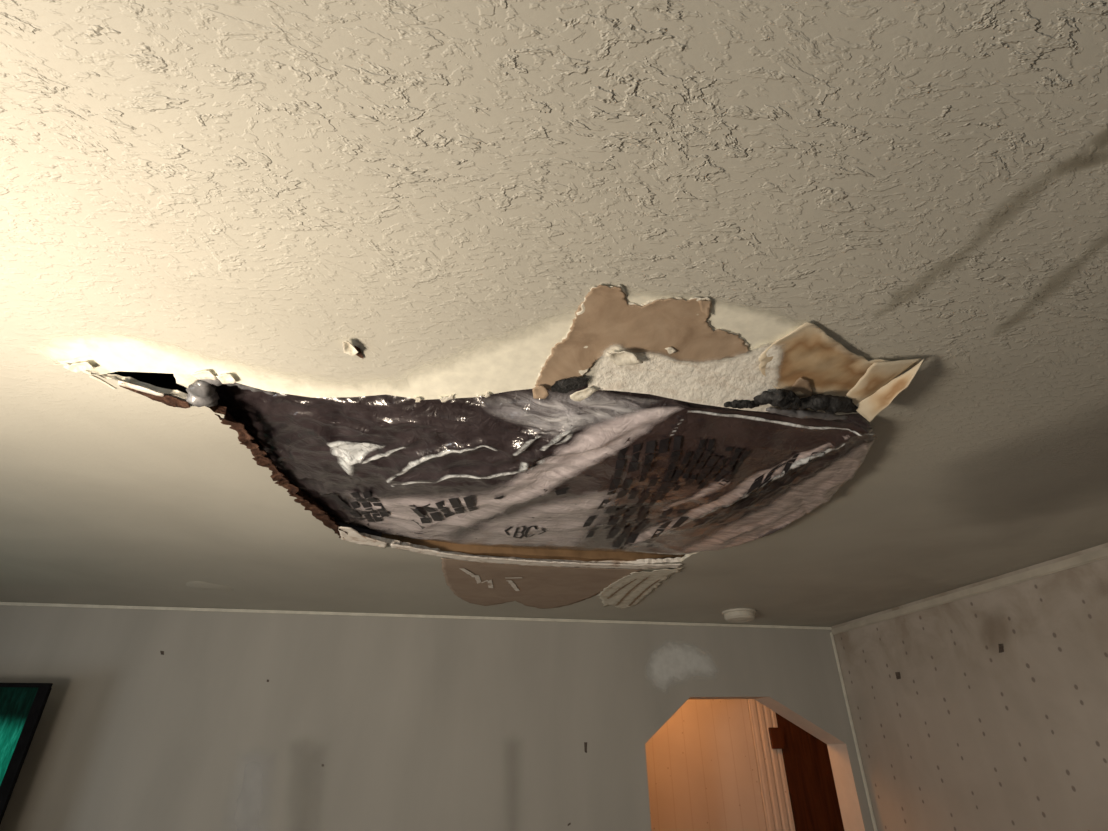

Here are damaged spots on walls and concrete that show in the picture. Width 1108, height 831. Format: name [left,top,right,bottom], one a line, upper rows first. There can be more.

peeling [626,294,690,304]
peeling [707,303,801,351]
peeling [44,312,576,402]
flaking render [606,351,643,366]
flaking render [570,387,598,402]
spalling [206,405,236,422]
spalling [276,466,698,564]